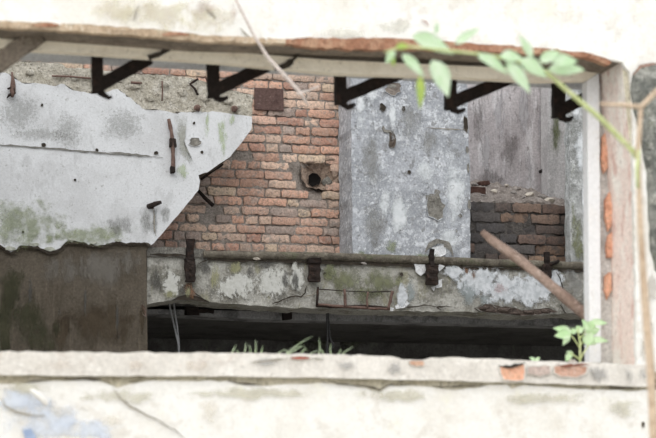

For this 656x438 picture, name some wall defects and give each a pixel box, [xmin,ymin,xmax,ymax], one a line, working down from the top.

spalling [3,61,91,93]
spalling [104,74,253,116]
flaking render [178,125,202,159]
damp [49,221,125,241]
peeling [380,192,411,233]
peeling [422,161,471,256]
damp [0,271,32,351]
damp [32,291,145,352]
spalling [316,283,409,311]
peeling [414,264,426,276]
peeling [431,264,559,316]
flaking render [498,362,589,381]